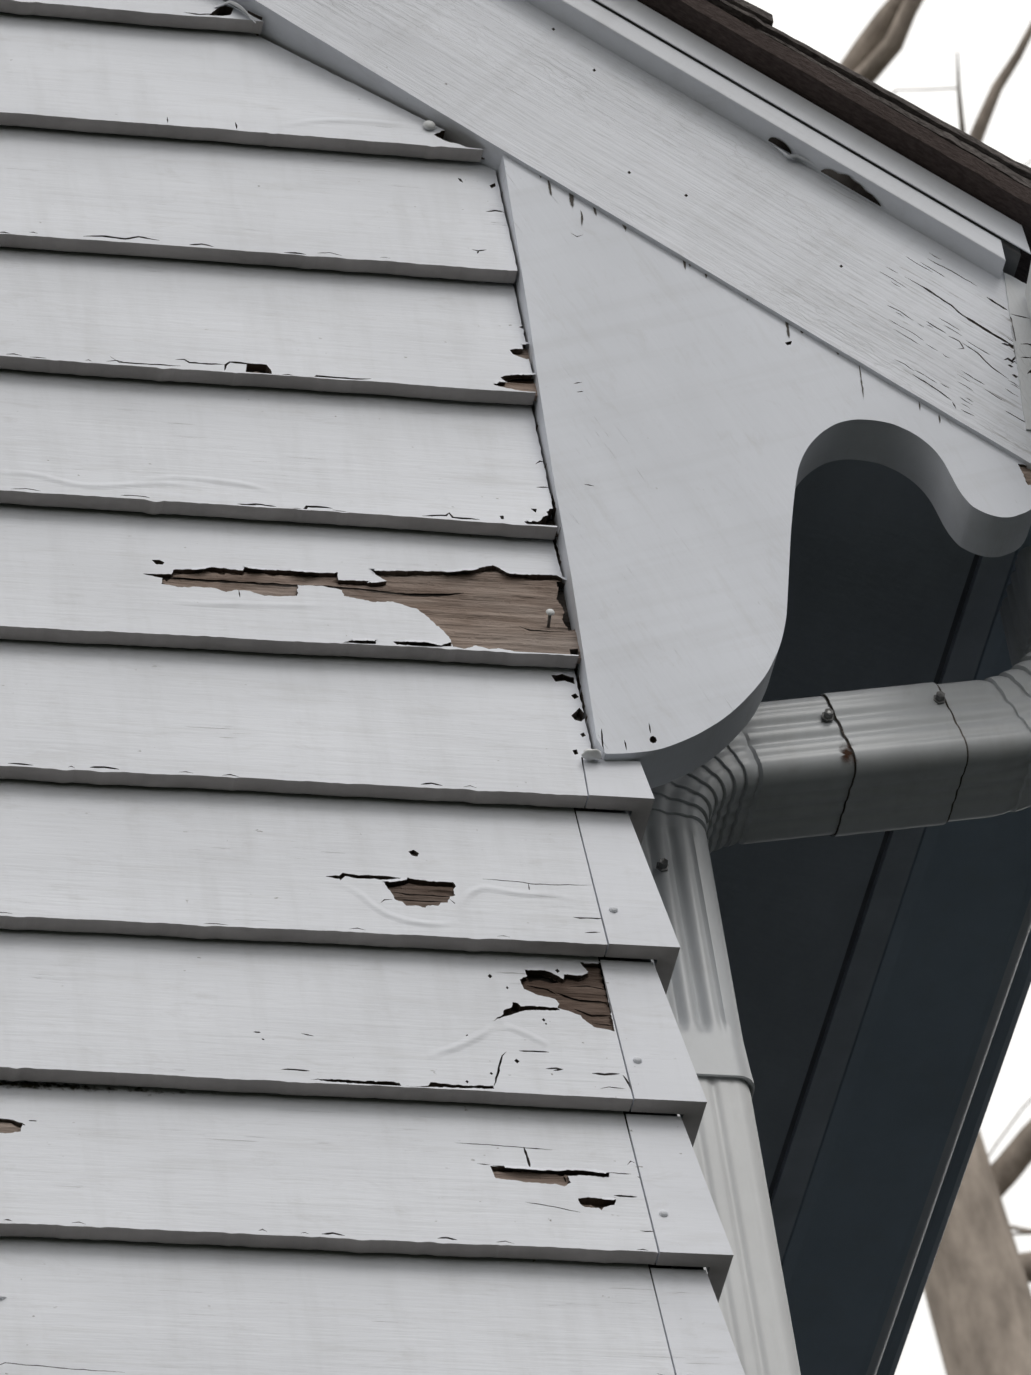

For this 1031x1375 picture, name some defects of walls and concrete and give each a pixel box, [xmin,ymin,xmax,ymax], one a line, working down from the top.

peeling [493,331,538,401]
peeling [155,563,581,682]
peeling [384,876,454,908]
peeling [521,961,613,1031]
peeling [0,1122,22,1133]
peeling [493,1165,607,1186]